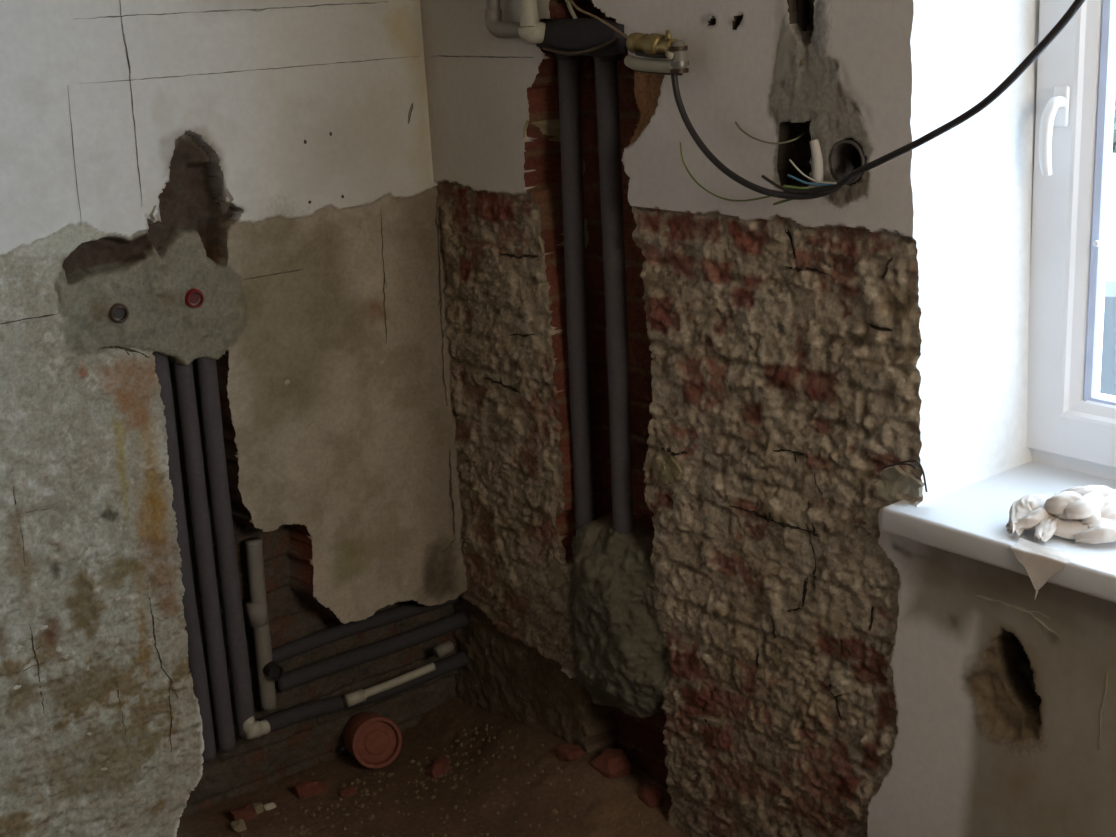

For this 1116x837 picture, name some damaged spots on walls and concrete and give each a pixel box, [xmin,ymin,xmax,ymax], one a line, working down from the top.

spalling [777,121,812,187]
flaking render [0,205,203,837]
corrosion [75,351,184,687]
crack [147,581,178,750]
flaking render [227,180,578,677]
crack [730,506,820,668]
flaking render [629,203,924,837]
crack [773,449,822,494]
spalling [965,628,1041,727]
flaking render [252,802,277,814]